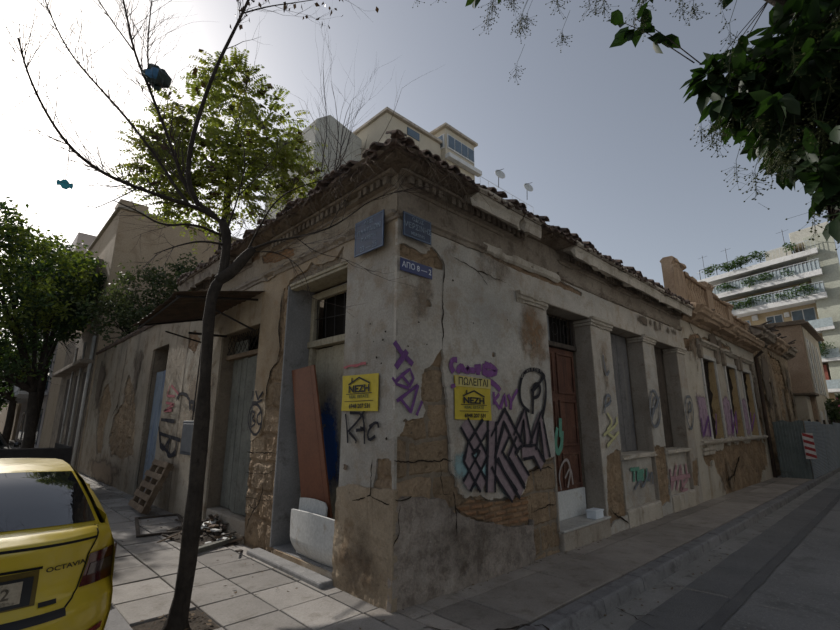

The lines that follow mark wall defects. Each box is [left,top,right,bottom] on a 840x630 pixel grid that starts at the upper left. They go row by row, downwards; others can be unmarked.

spalling [400,244,443,270]
crack [441,256,506,348]
spalling [109,377,136,459]
spalling [244,250,343,553]
crack [352,464,412,546]
crack [394,458,461,537]
spalling [374,350,560,560]
spalling [606,449,626,526]